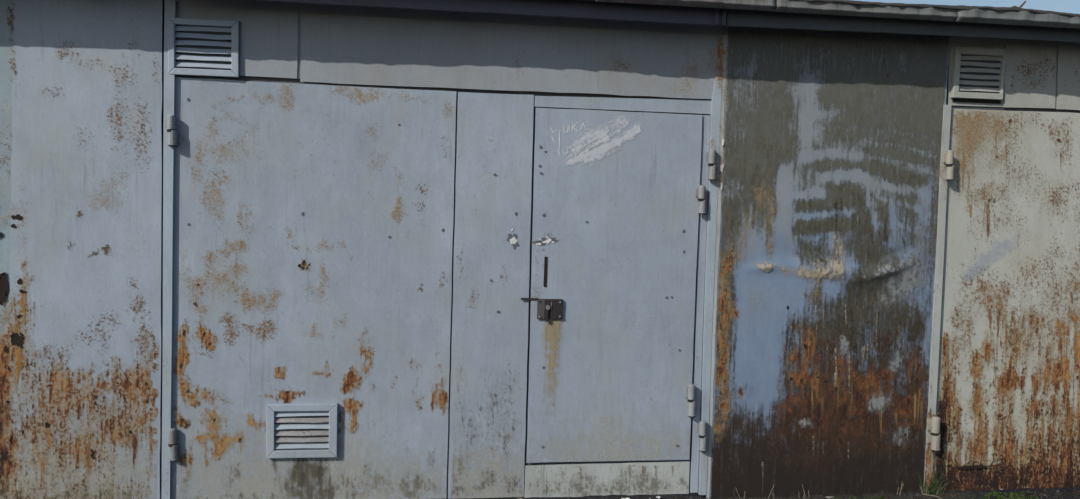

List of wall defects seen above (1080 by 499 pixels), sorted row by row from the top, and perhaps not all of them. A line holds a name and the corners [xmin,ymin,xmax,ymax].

rust [0,261,159,499]
rust [174,205,281,473]
rust [265,367,305,403]
rust [339,331,375,433]
rust [714,110,1080,492]